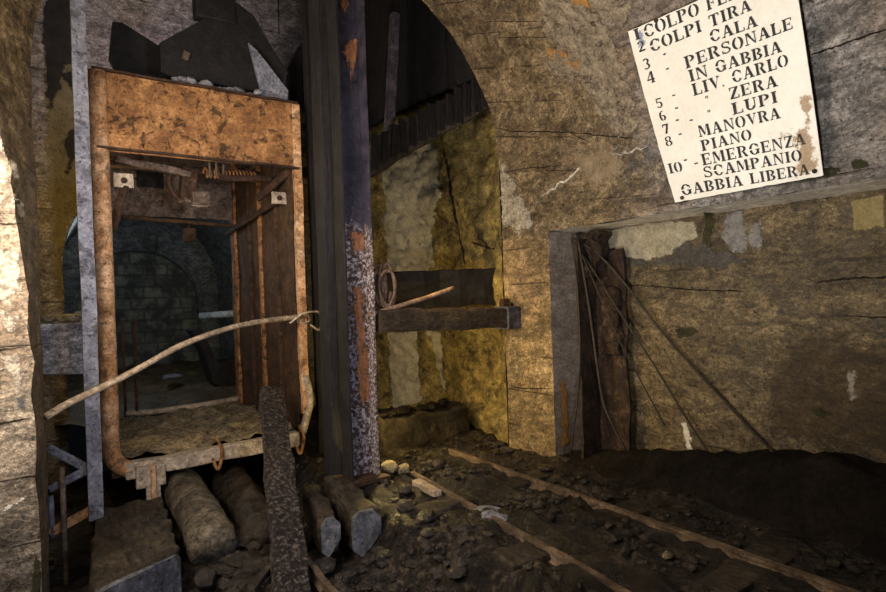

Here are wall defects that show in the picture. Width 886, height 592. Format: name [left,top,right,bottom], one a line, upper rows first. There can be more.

rust [344,39,357,78]
spalling [538,0,639,138]
crack [443,148,497,266]
peeling [605,220,698,261]
peeling [722,210,763,253]
crack [806,275,886,283]
rust [352,286,369,404]